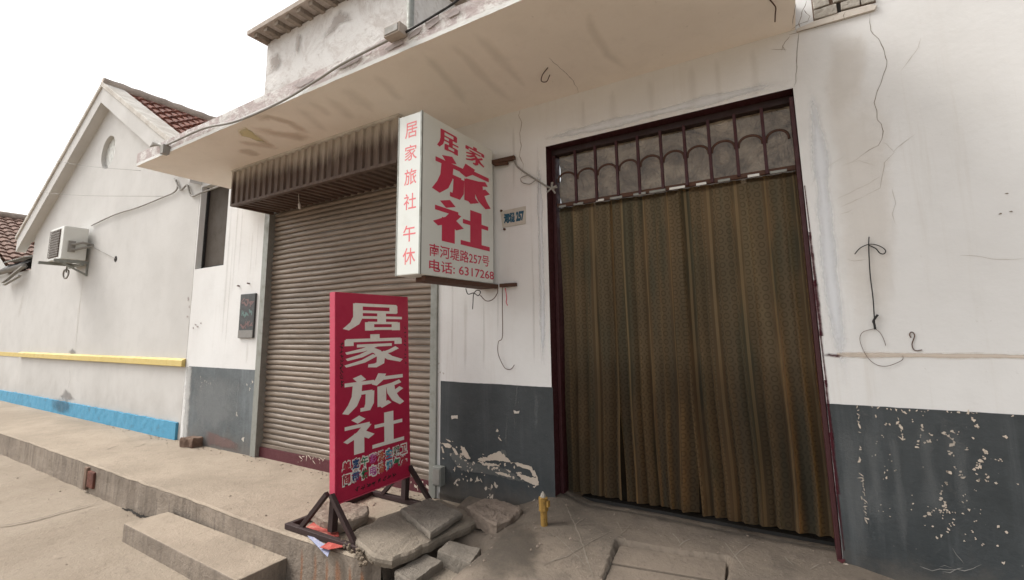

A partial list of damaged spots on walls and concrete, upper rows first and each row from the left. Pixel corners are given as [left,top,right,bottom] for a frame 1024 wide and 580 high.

crack [772,1,921,222]
peeling [440,429,539,501]
peeling [858,406,1003,547]